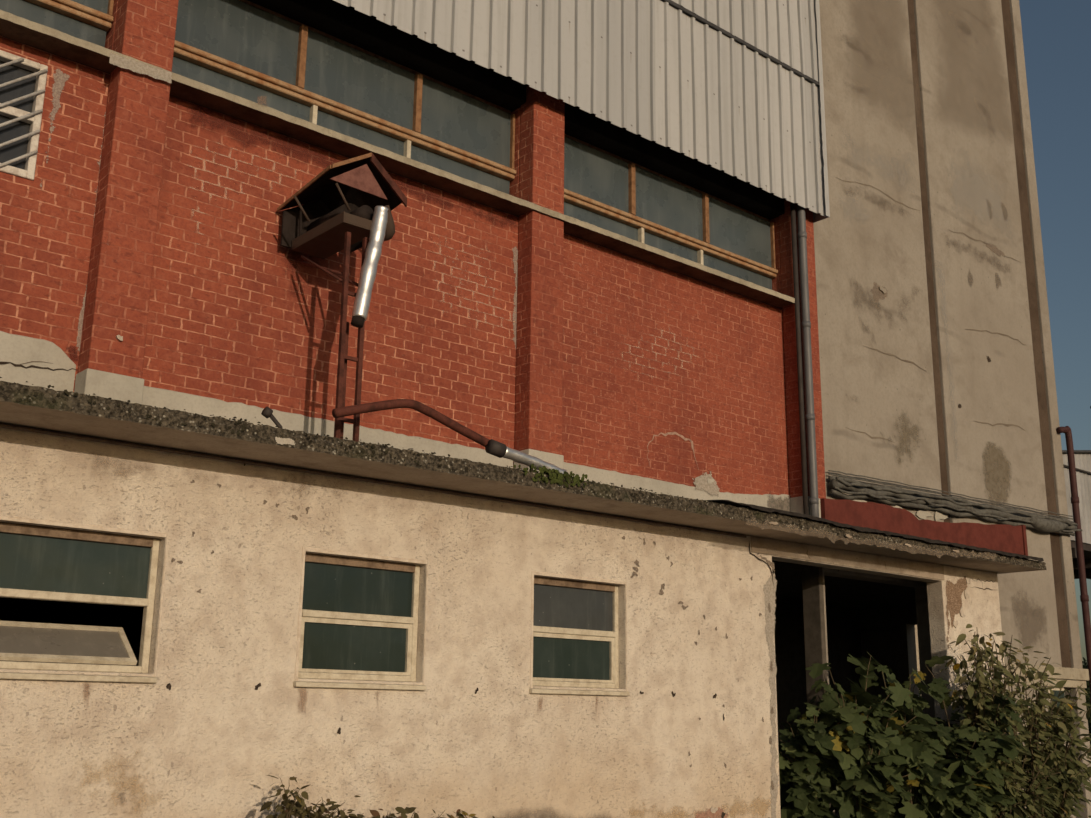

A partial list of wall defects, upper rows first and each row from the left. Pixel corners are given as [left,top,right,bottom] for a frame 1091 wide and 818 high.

peeling [55,72,70,93]
crack [836,177,920,211]
crack [952,231,1017,265]
crack [0,361,77,371]
spalling [692,472,720,496]
damp [984,442,1010,506]